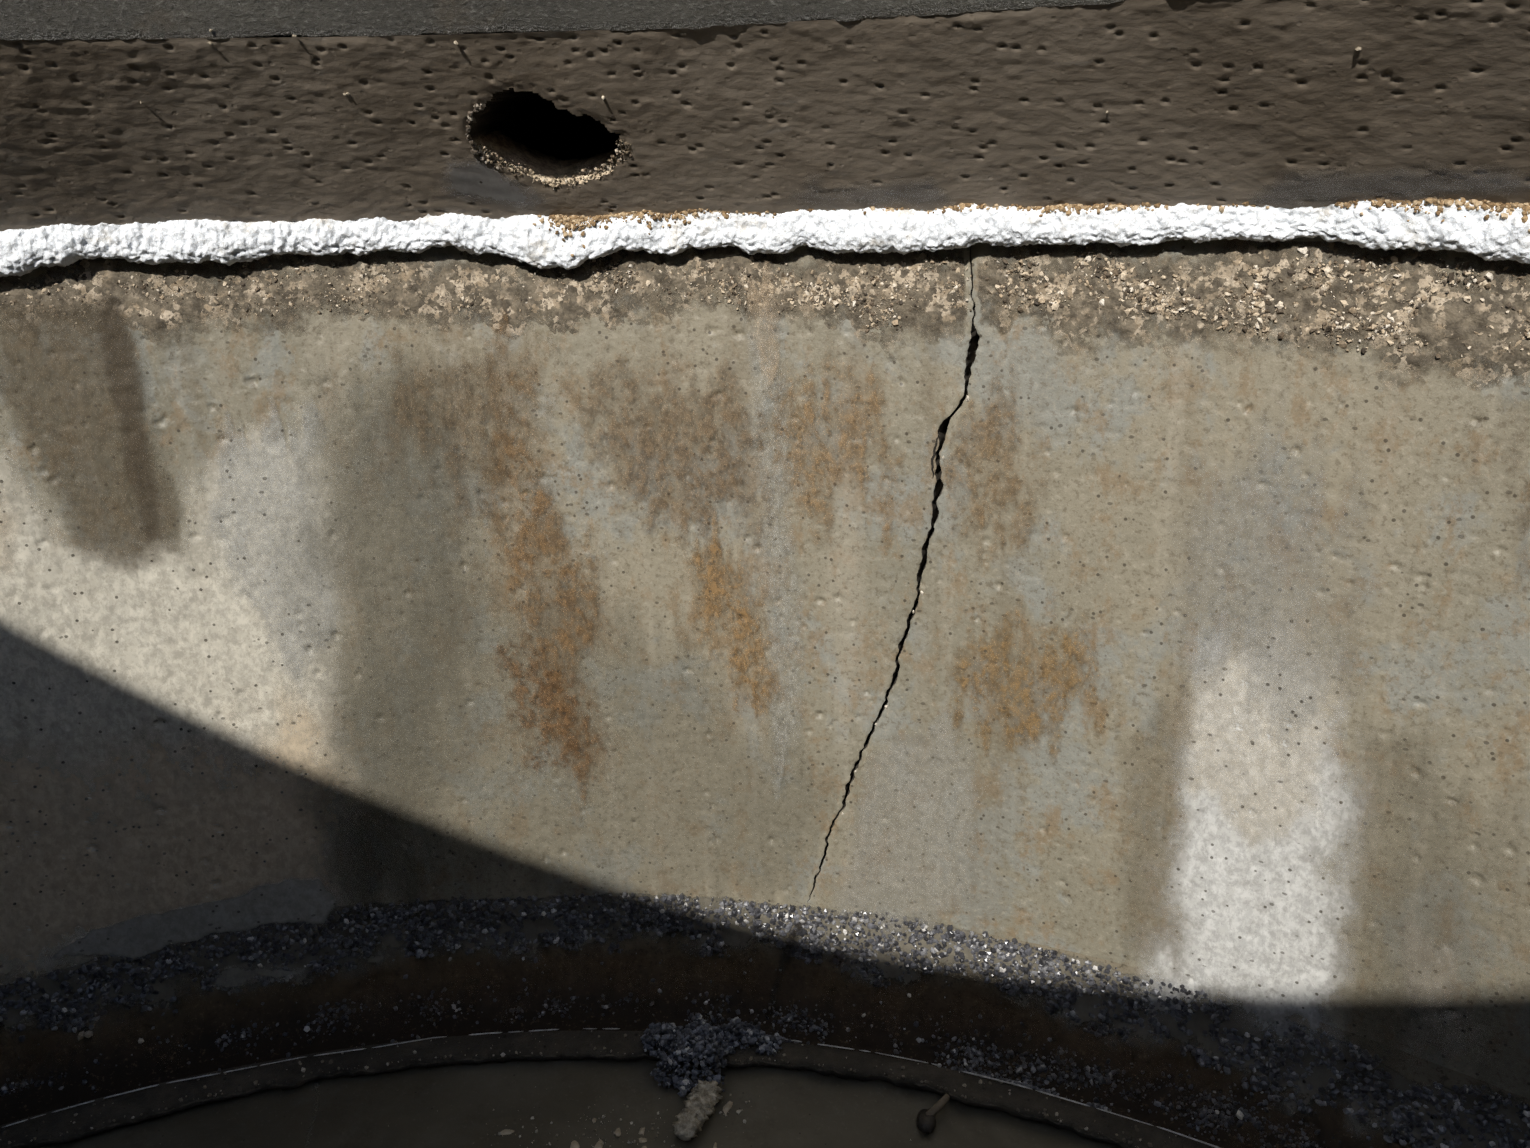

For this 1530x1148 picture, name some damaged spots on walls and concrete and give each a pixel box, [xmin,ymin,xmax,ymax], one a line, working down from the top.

spalling [465,88,632,191]
leakage [0,299,450,971]
corrosion [693,536,775,716]
crack [772,246,980,1003]
corrosion [954,614,1101,753]
leakage [1151,636,1357,1032]